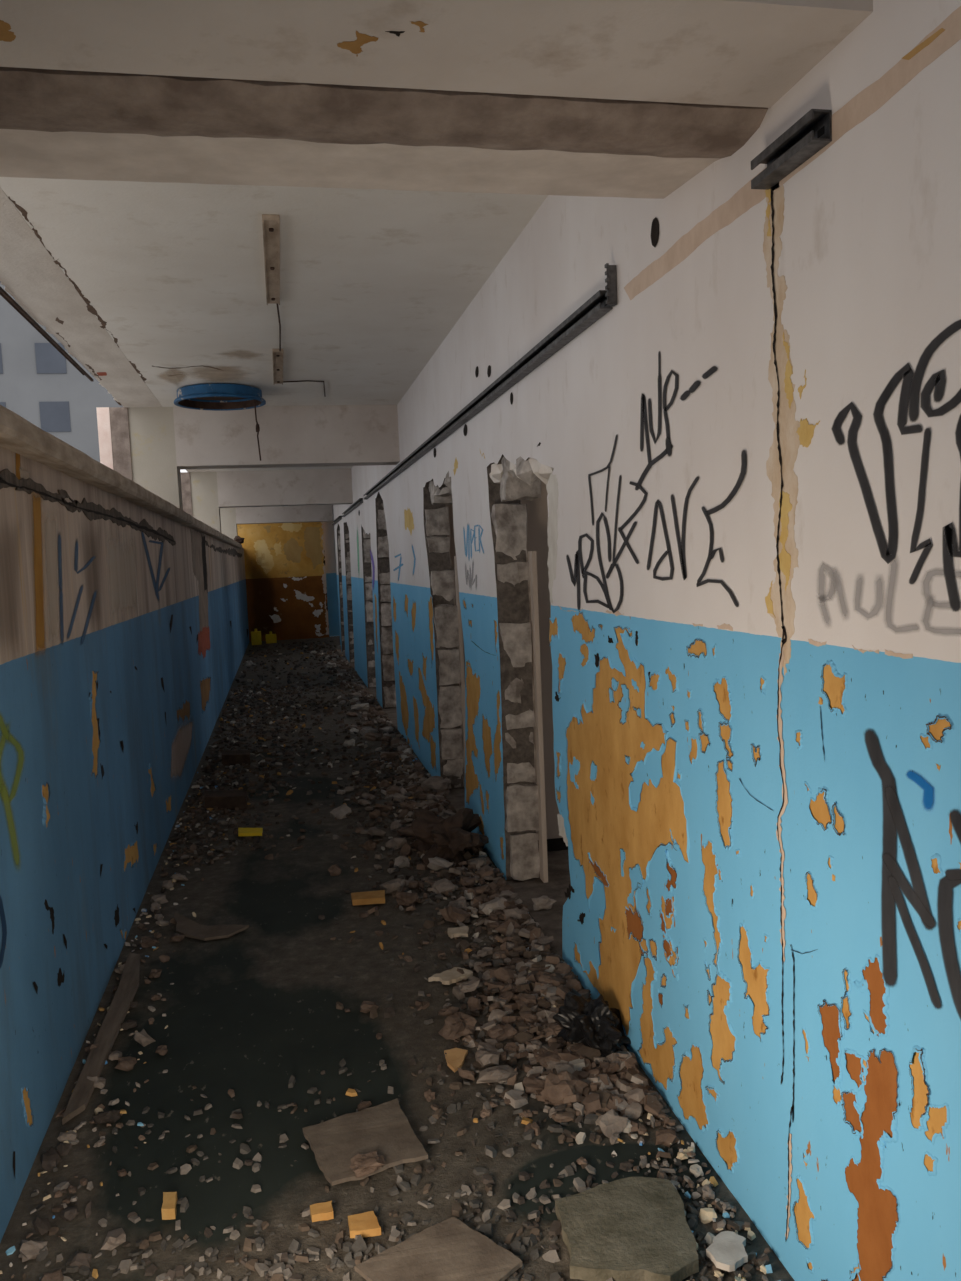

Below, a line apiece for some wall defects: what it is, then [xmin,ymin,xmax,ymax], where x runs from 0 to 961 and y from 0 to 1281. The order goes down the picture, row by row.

peeling [0,20,16,42]
peeling [337,21,429,56]
peeling [808,639,847,718]
crack [739,185,820,1242]
peeling [919,713,954,770]
peeling [254,442,771,1174]
peeling [804,781,847,836]
peeling [804,871,819,910]
peeling [930,853,943,876]
peeling [21,1085,34,1128]
peeling [802,954,949,1281]
peeling [792,1149,829,1281]